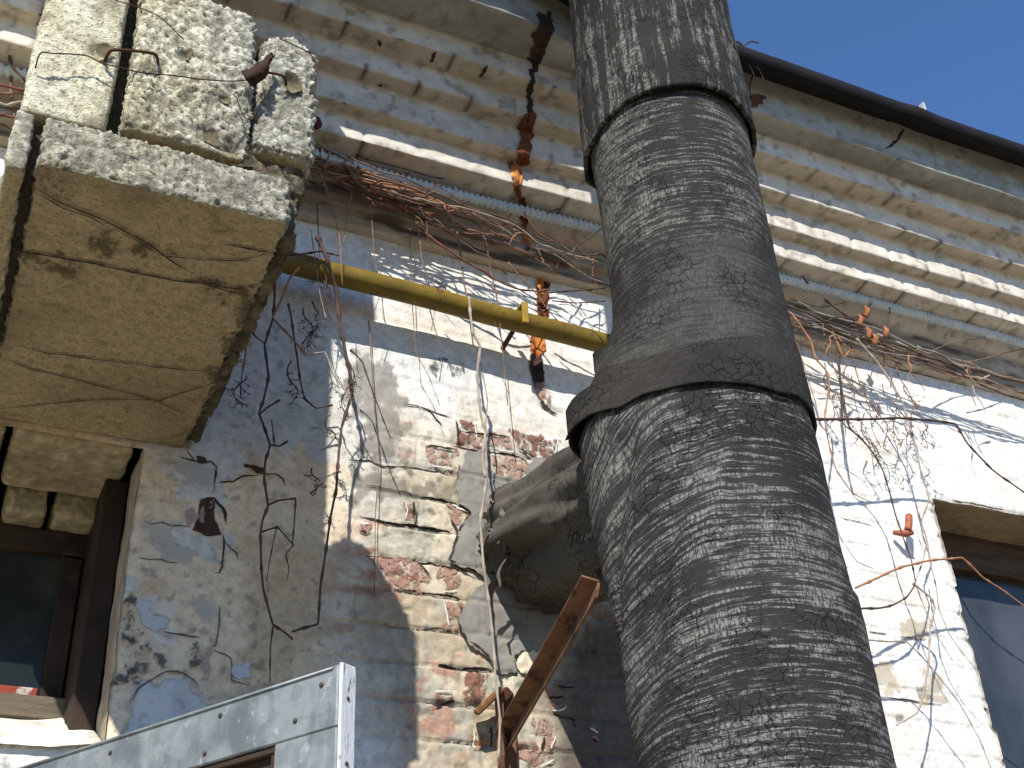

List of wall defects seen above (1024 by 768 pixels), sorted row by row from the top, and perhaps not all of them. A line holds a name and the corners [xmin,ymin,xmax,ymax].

crack [507,9,555,251]
crack [15,189,272,296]
crack [3,345,222,421]
crack [529,278,557,415]
spalling [425,419,561,480]
spalling [186,497,227,536]
spalling [447,504,471,533]
spalling [370,556,464,631]
leakage [110,593,166,685]
leakage [179,642,203,674]
spalling [429,668,493,710]
spalling [516,694,567,767]